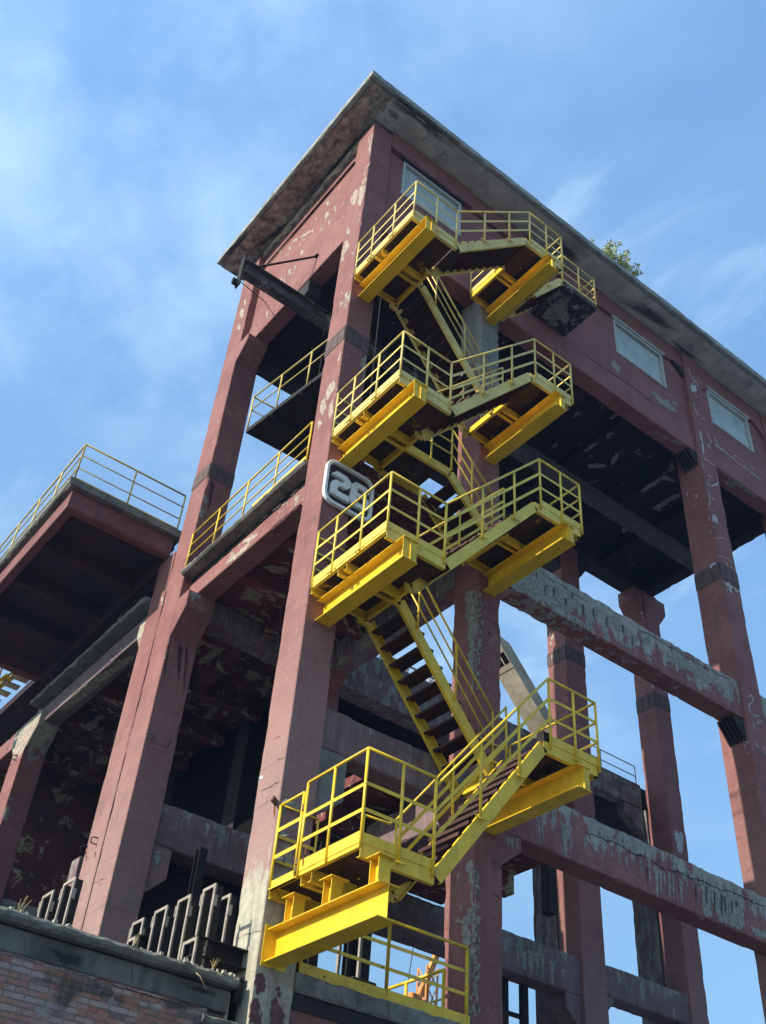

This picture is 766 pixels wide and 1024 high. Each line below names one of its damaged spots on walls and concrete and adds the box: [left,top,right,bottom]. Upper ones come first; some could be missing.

peeling [351,180,365,206]
peeling [277,200,337,283]
peeling [518,574,650,649]
crack [586,832,765,907]
peeling [611,848,766,939]
spalling [450,860,481,1023]